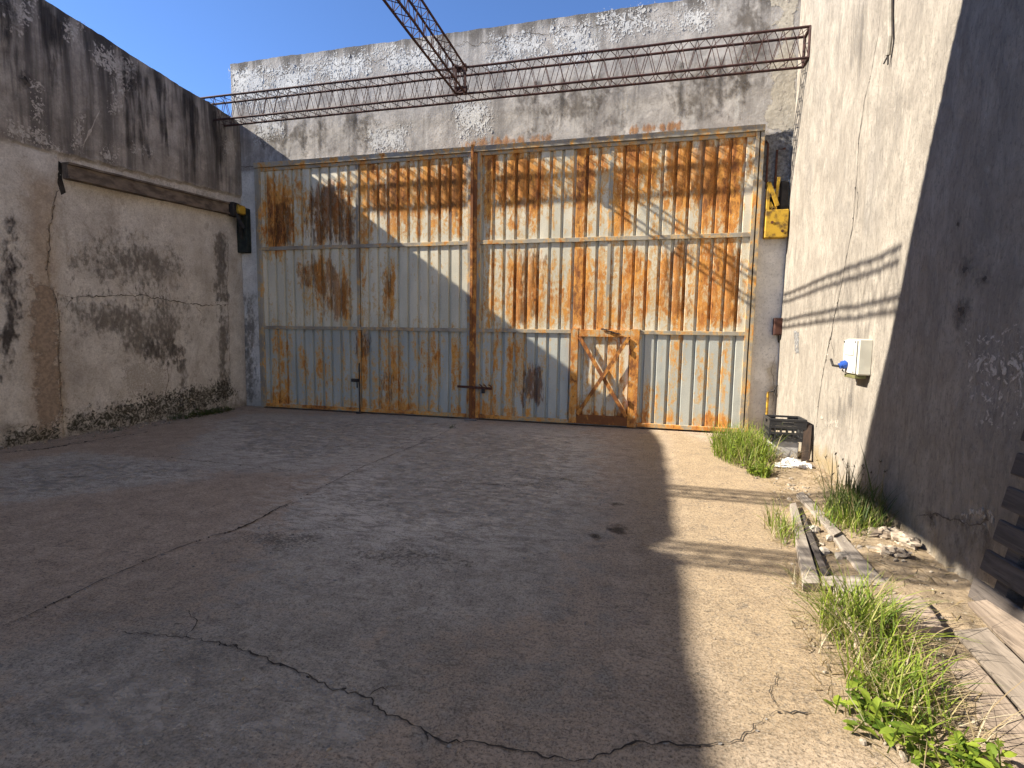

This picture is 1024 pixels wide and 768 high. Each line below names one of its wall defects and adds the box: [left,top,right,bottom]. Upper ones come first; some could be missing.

rust [412,134,551,216]
rust [629,122,729,207]
water stain [0,218,22,364]
water stain [74,246,179,284]
water stain [72,304,185,385]
crack [45,173,231,416]
water stain [214,233,229,397]
rust [270,180,354,320]
rust [506,249,547,324]
rust [662,240,691,319]
crack [0,427,456,628]
crack [111,610,808,763]